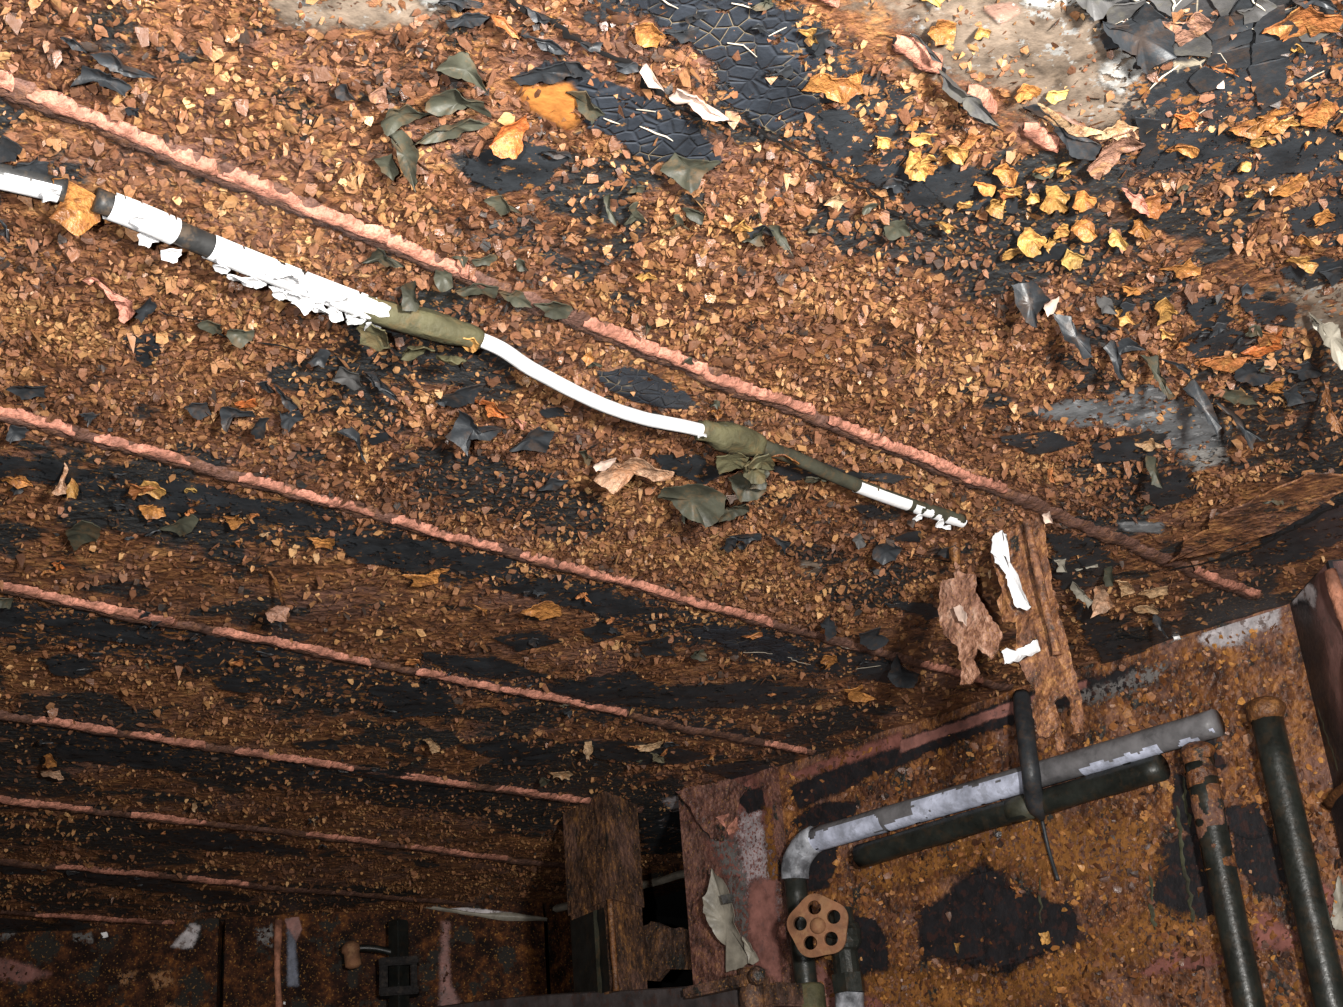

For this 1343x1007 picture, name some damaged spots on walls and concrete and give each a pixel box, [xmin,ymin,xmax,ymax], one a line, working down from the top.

peeling [268,0,490,32]
crack [1116,0,1182,24]
crack [1149,65,1179,90]
peeling [334,51,573,217]
crack [487,0,944,238]
rust [48,177,112,236]
peeling [843,0,1343,533]
peeling [160,311,573,456]
peeling [581,351,727,426]
rust [52,462,79,499]
rust [265,571,290,631]
peeling [1042,472,1343,664]